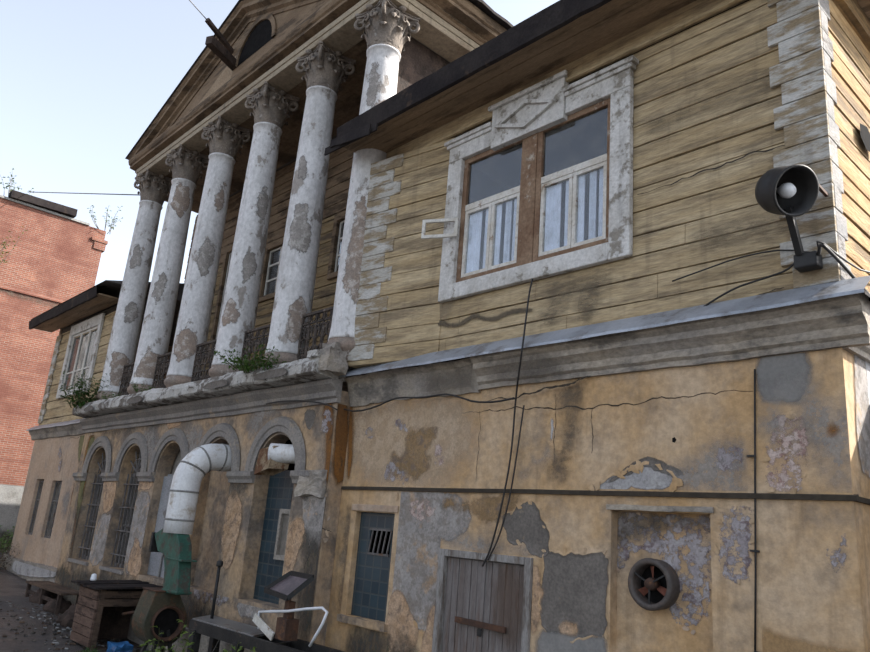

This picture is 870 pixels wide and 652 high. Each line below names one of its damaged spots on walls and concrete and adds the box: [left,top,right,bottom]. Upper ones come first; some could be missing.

peeling [298,156,307,180]
crack [637,145,785,195]
peeling [197,239,215,276]
peeling [288,203,312,253]
peeling [342,195,367,303]
peeling [174,328,198,362]
crack [459,376,748,478]
peeling [762,413,809,494]
peeling [410,498,435,522]
flaking render [501,499,758,643]
flaking render [386,590,435,652]